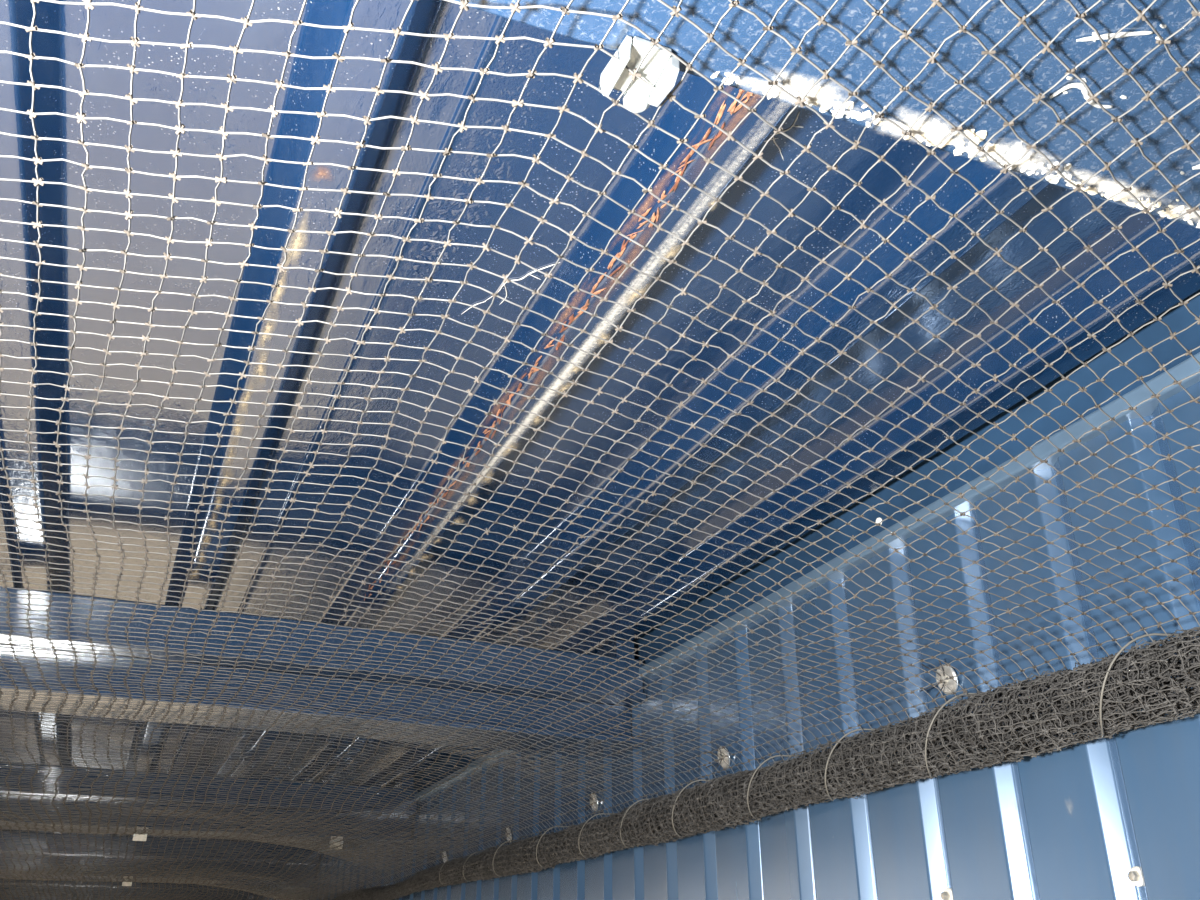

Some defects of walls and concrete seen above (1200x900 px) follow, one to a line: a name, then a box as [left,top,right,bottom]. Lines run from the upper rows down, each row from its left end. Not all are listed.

corrosion [364,89,758,601]
peeling [711,71,1200,228]